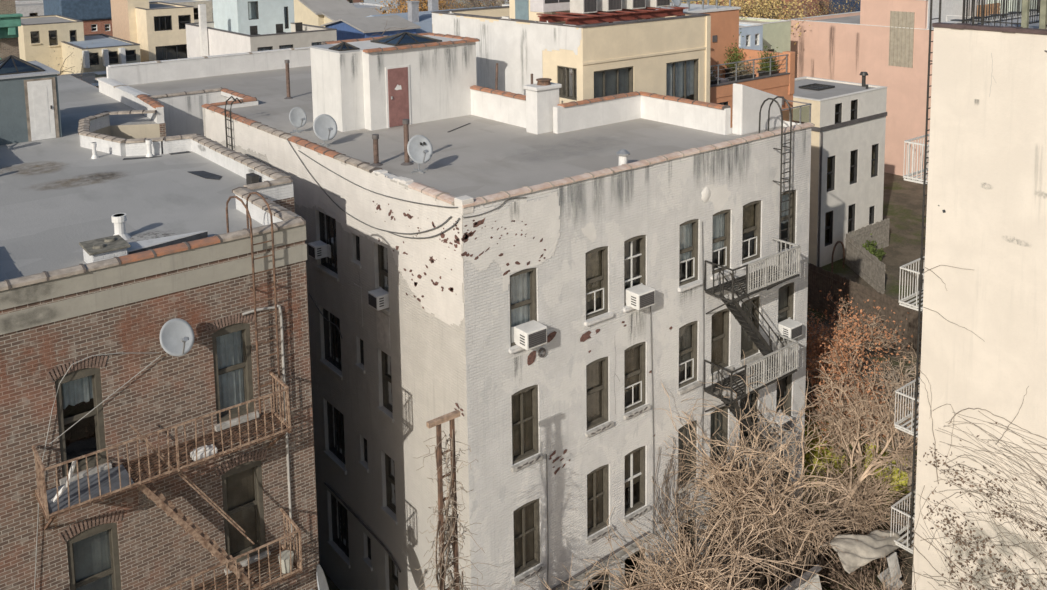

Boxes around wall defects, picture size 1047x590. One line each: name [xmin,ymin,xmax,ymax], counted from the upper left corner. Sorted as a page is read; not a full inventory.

peeling [205,108,560,327]
spalling [527,331,557,366]
peeling [518,449,570,475]